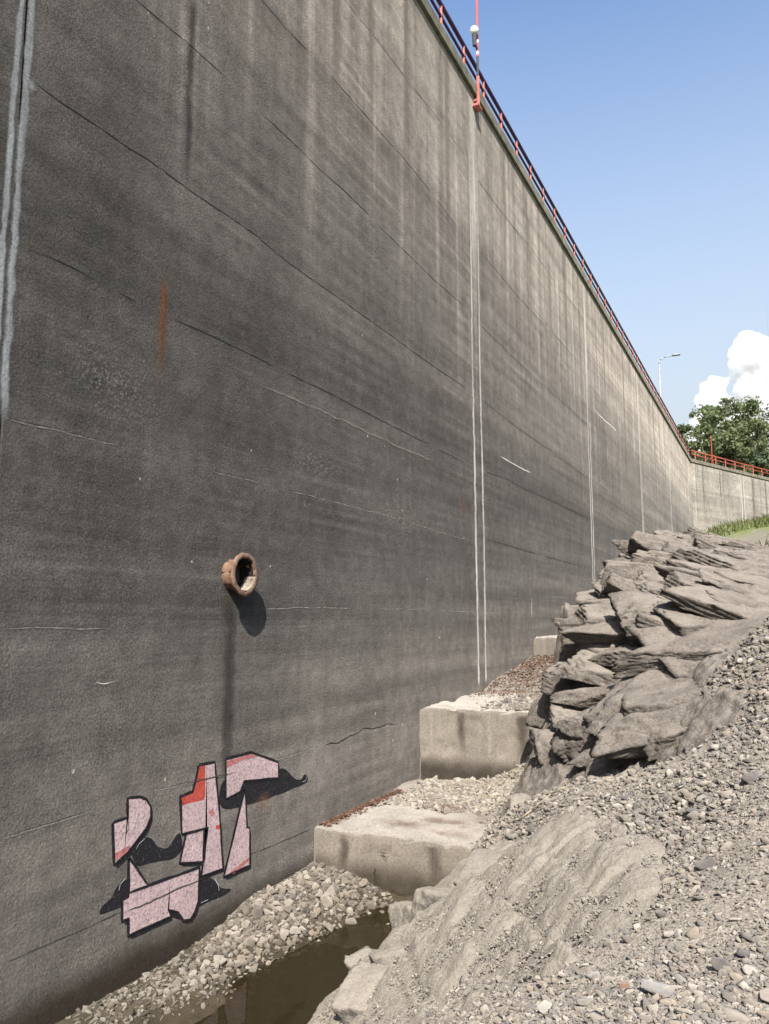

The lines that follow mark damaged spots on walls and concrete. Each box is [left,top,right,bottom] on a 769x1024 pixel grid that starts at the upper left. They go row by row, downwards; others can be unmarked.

crack [276,723,393,759]
crack [2,810,88,838]